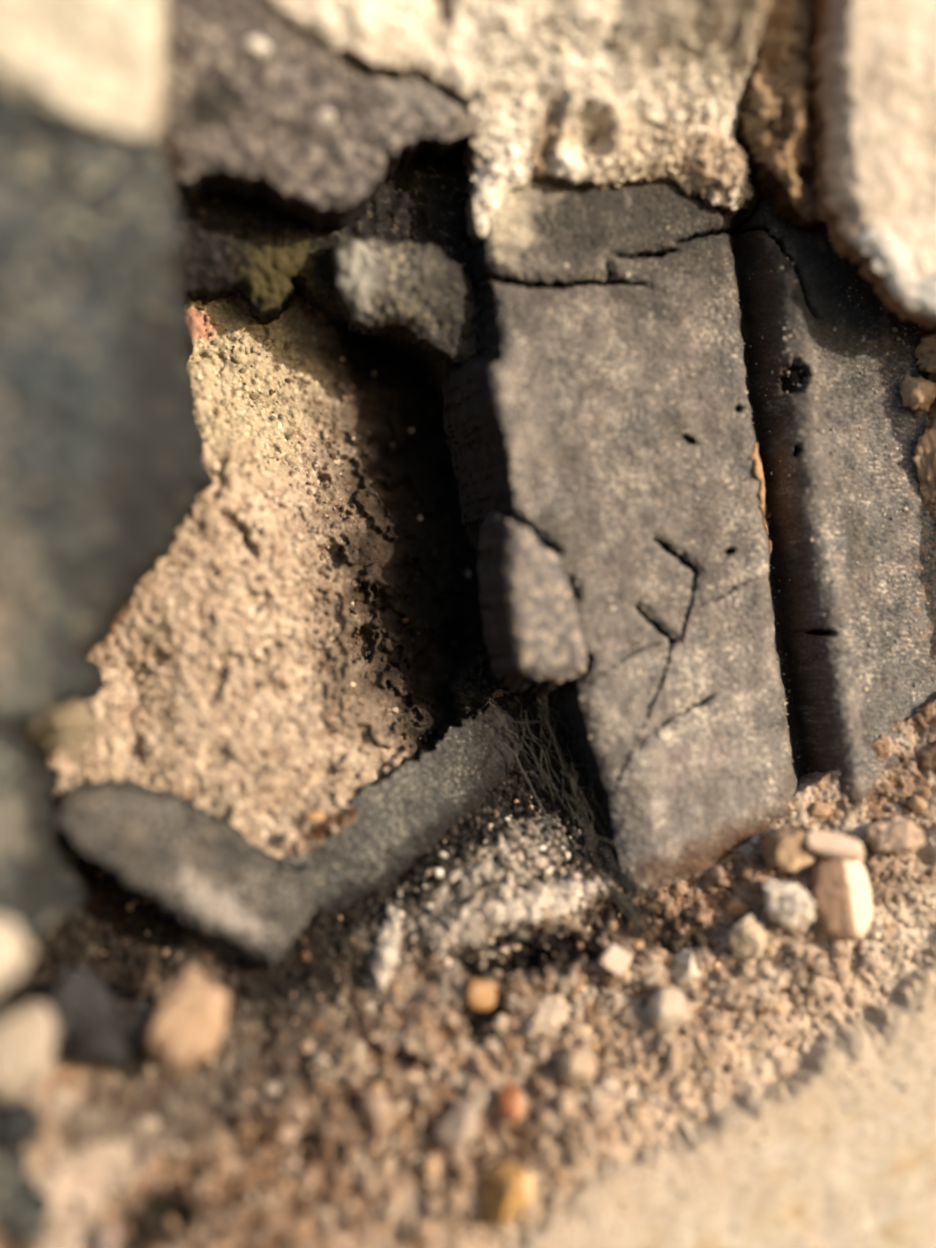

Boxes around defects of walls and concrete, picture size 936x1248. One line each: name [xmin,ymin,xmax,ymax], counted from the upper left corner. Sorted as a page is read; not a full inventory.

crack [487,198,814,316]
spalling [48,292,588,858]
crack [513,512,579,599]
crack [579,650,596,682]
crack [617,538,710,777]